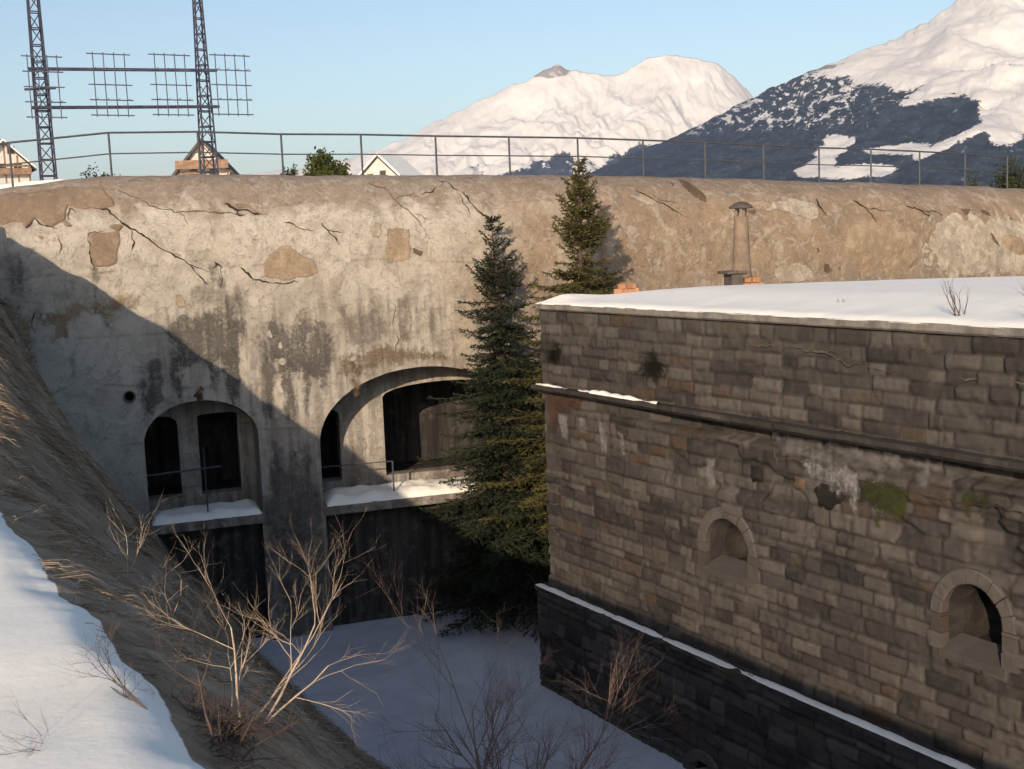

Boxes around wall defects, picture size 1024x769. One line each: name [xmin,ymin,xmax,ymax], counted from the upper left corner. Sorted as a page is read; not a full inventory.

crack [26,188,297,287]
crack [285,221,344,244]
crack [365,179,490,237]
crack [853,200,945,222]
damp [141,301,245,414]
spalling [751,465,763,482]
spalling [794,477,845,511]
damp [804,462,857,510]